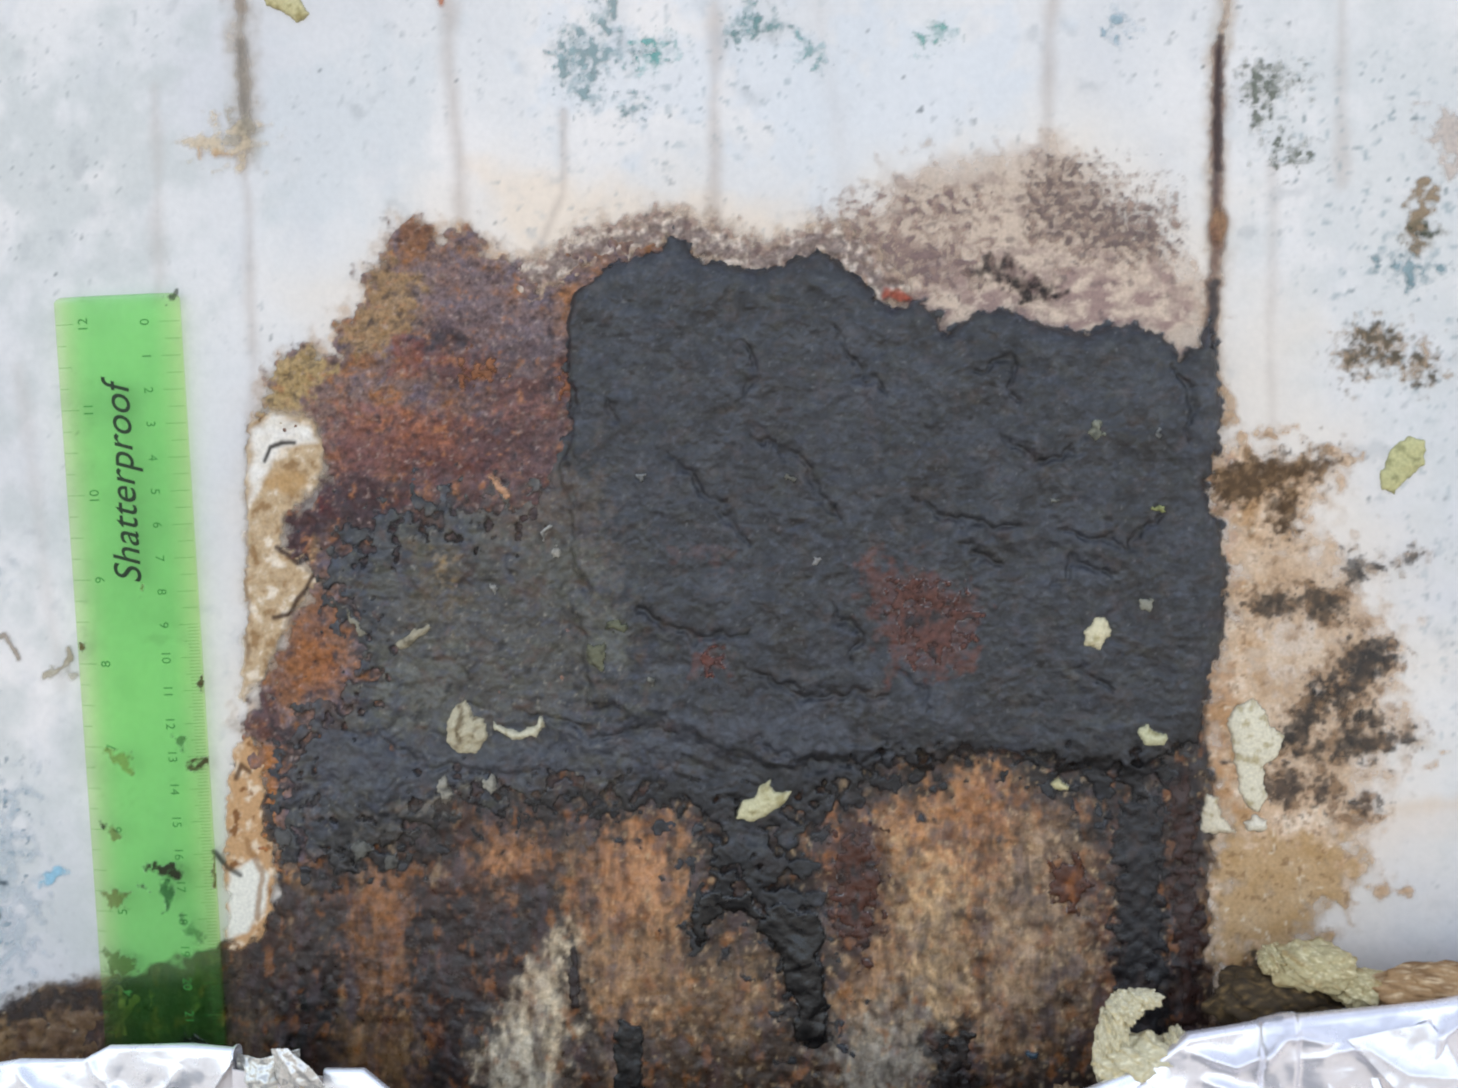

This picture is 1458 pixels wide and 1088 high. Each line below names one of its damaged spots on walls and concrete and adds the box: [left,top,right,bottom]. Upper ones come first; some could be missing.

peeling [516,202,912,307]
water stain [837,150,1207,362]
crack [1203,0,1234,407]
water stain [1240,59,1314,170]
water stain [1338,321,1439,387]
water stain [1402,109,1458,256]
peeling [238,411,324,702]
rust [83,213,1230,1088]
water stain [1203,408,1425,995]
peeling [212,737,277,950]